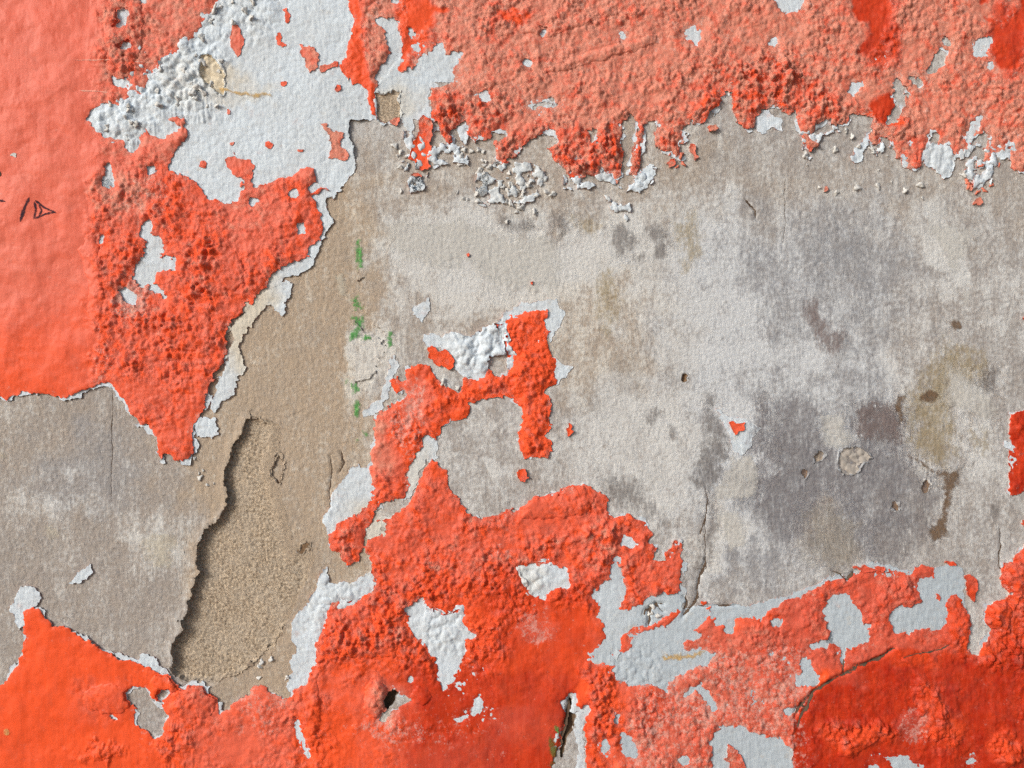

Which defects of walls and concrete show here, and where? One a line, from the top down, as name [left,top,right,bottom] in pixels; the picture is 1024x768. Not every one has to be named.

peeling [885,36,951,125]
damp [803,301,843,352]
damp [921,371,996,418]
damp [822,402,899,447]
peeling [516,558,571,600]
peeling [404,597,496,722]
peeling [769,593,871,687]
peeling [379,676,414,722]
crack [795,644,950,727]
peeling [551,693,638,768]
peeling [709,725,794,768]
peeling [869,753,924,768]